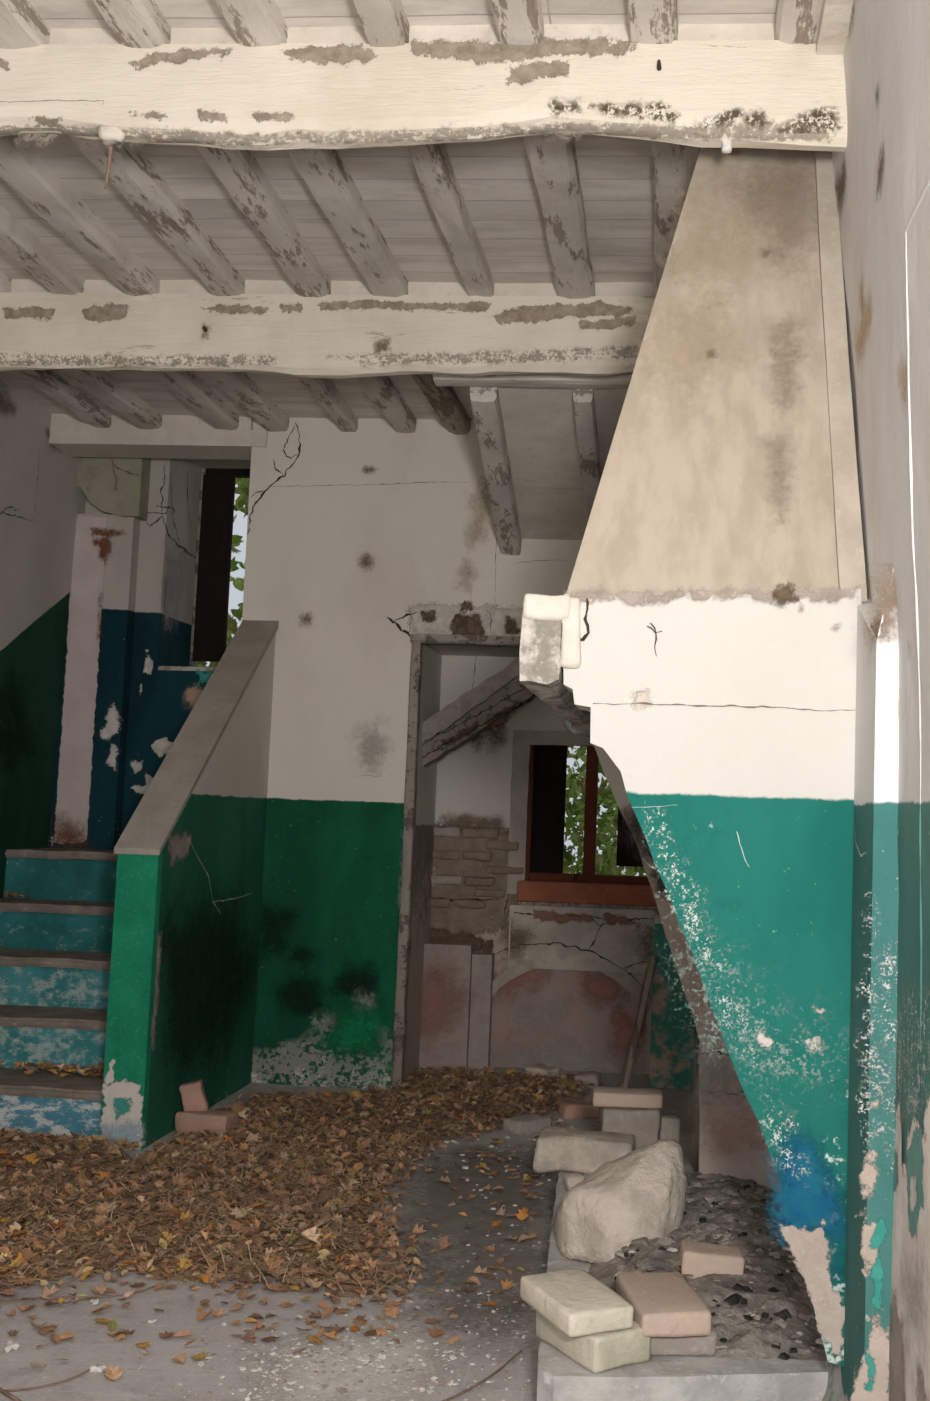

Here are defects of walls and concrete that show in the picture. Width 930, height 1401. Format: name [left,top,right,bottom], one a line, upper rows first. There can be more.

peeling [283,43,377,66]
peeling [121,108,829,147]
peeling [202,299,640,366]
crack [0,449,40,521]
crack [247,422,428,534]
corrosion [91,528,122,561]
flaking render [566,580,855,611]
peeling [100,702,174,794]
leakage [160,895,377,1076]
peeling [645,808,839,1082]
peeling [850,892,930,1401]
peeling [780,1219,845,1360]